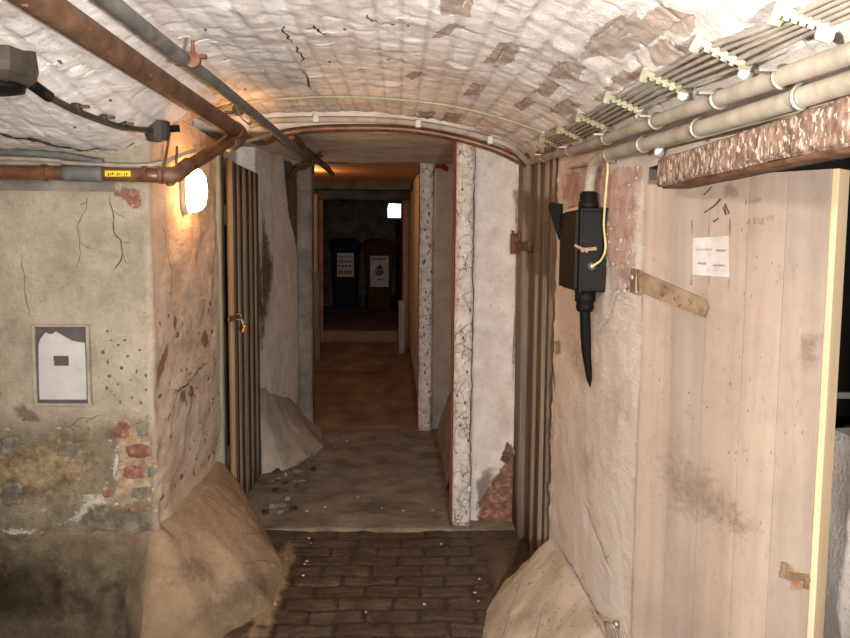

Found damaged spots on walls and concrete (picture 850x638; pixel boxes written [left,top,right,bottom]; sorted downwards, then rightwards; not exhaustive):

crack [281,25,326,90]
peeling [429,0,473,39]
peeling [482,42,519,65]
peeling [511,3,695,111]
peeling [417,111,463,122]
crack [76,198,88,272]
crack [109,196,127,270]
flaking render [107,182,147,208]
peeling [594,159,642,294]
water stain [259,218,273,337]
flaking render [453,147,513,521]
flaking render [0,396,168,513]